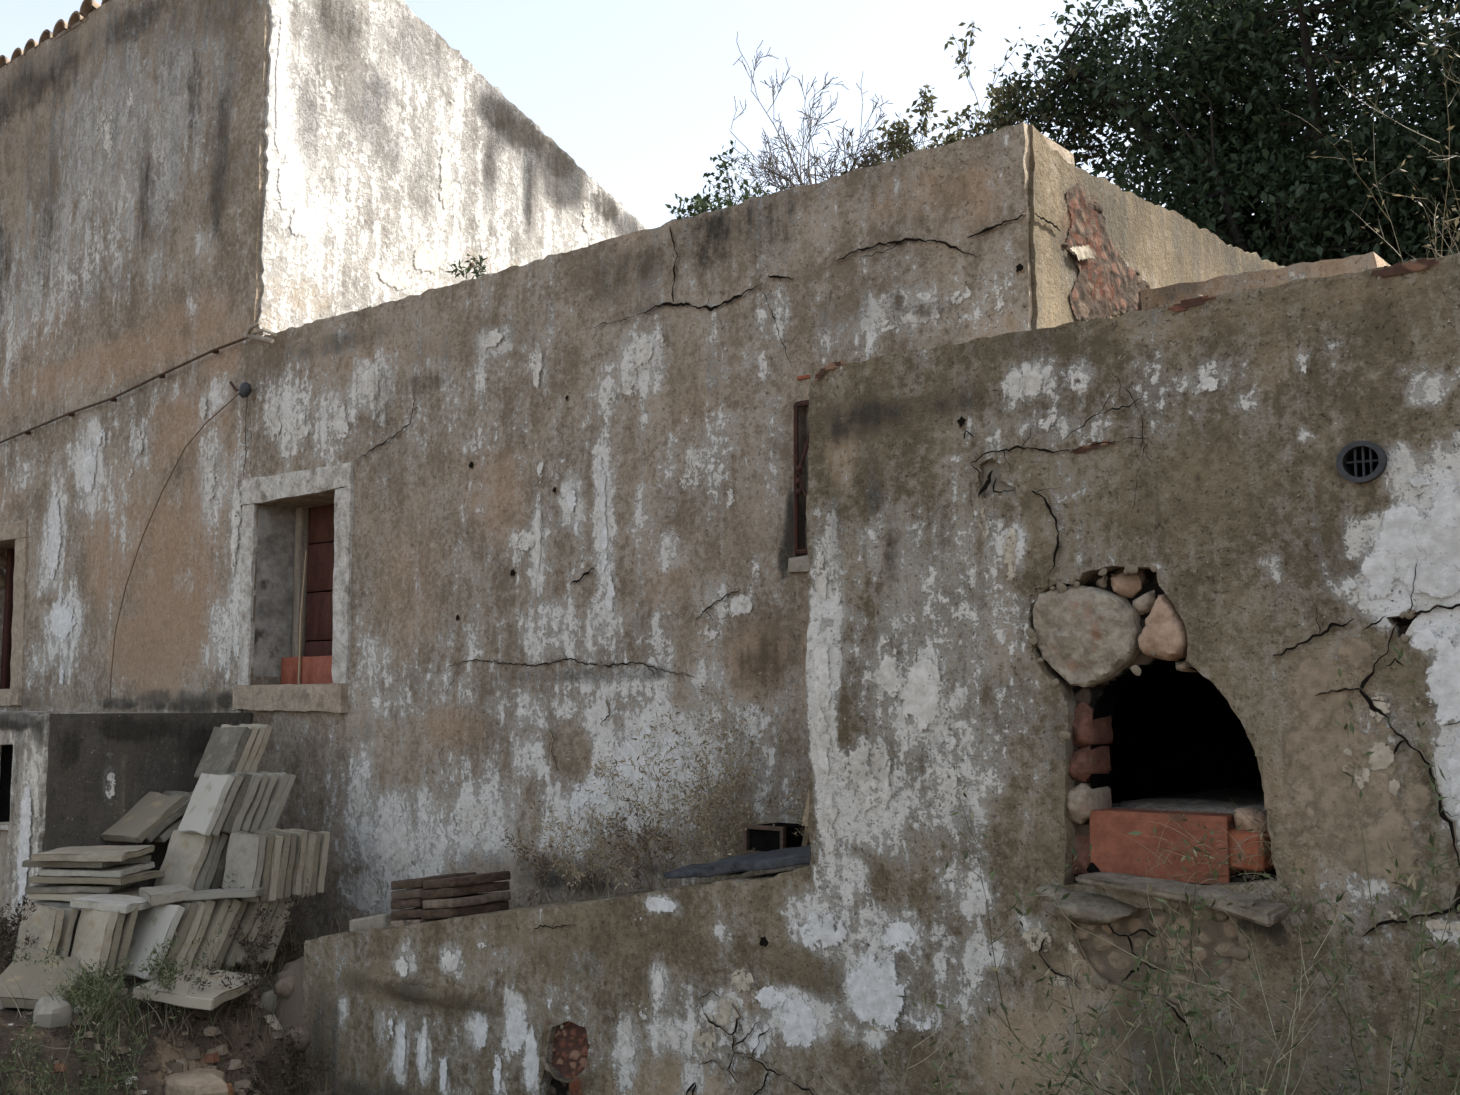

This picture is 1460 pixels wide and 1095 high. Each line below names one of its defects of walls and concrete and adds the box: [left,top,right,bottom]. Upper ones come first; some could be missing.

water stain [482,99,574,176]
water stain [594,193,618,220]
crack [593,226,797,367]
crack [835,213,1061,262]
crack [964,375,1152,574]
peeling [1340,474,1460,827]
flaking render [1026,564,1198,883]
flaking render [1282,635,1431,892]
crack [1272,564,1460,937]
peeling [793,910,936,1033]
peeling [473,999,593,1095]
crack [686,991,816,1095]